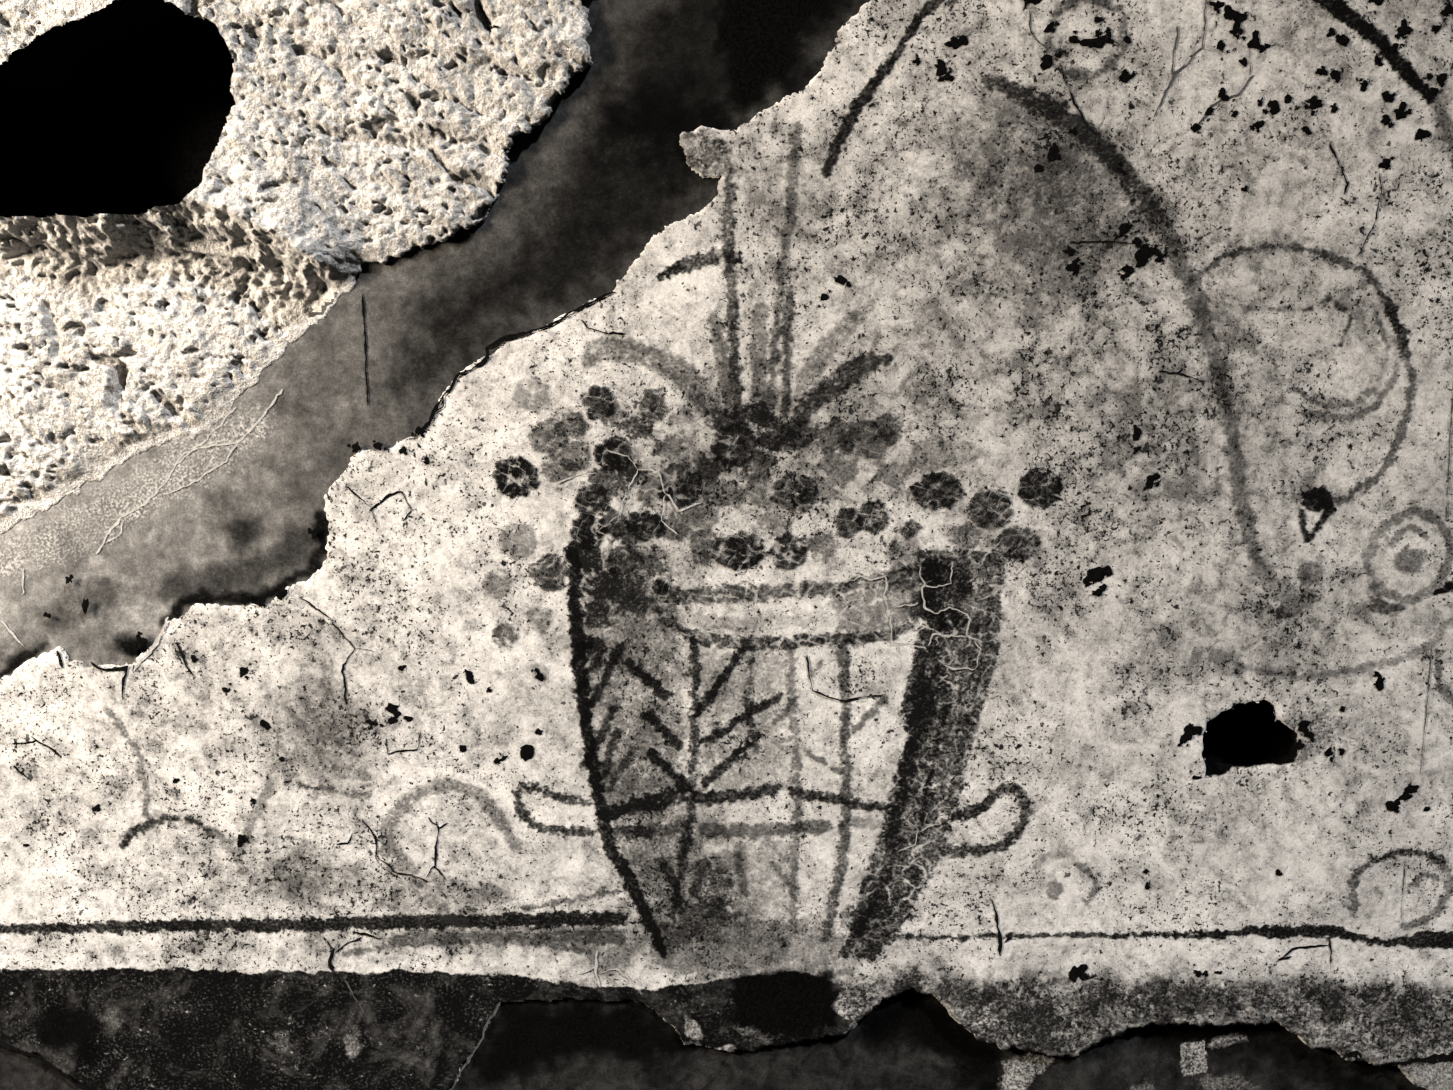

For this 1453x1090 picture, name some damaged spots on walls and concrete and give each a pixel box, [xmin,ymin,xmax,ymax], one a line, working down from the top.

spalling [0,0,593,536]
flaking render [818,275,852,301]
crack [1445,396,1453,520]
flaking render [240,584,288,607]
flaking render [124,631,148,655]
flaking render [222,667,249,692]
flaking render [464,669,492,692]
flaking render [365,703,413,730]
crack [1420,645,1432,774]
flaking render [493,728,543,764]
flaking render [1068,964,1089,982]
spalling [447,991,1427,1090]